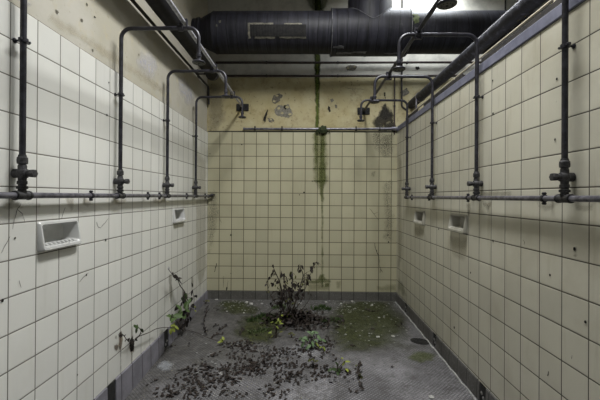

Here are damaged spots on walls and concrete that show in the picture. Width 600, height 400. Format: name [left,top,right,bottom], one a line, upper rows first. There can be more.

spalling [263,93,293,122]
damp [374,104,396,128]